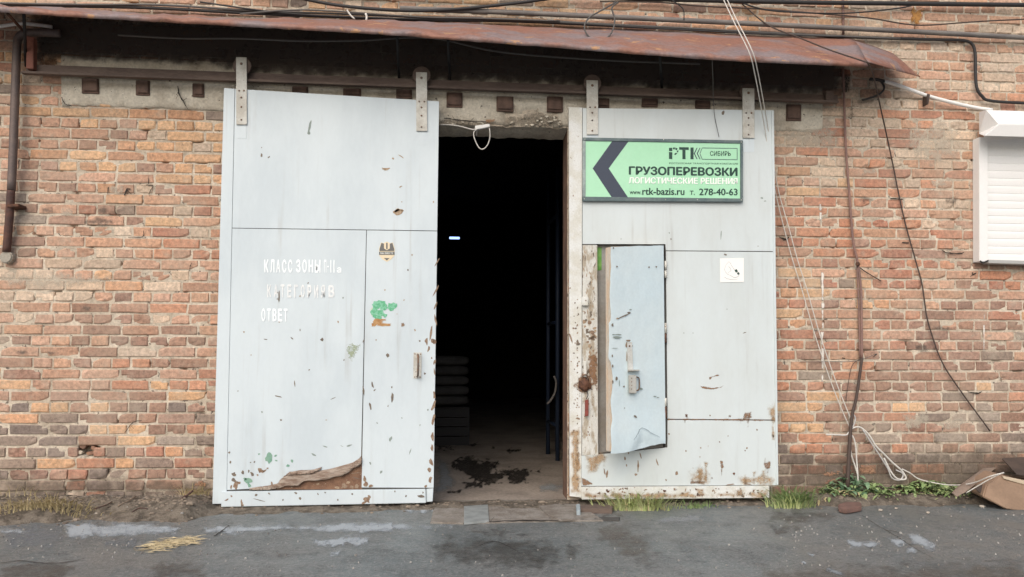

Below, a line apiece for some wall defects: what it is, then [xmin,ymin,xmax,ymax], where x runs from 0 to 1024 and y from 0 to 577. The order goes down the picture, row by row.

rust [574,352,597,392]
peeling [225,446,382,507]
water stain [438,442,540,493]
rust [571,431,771,498]